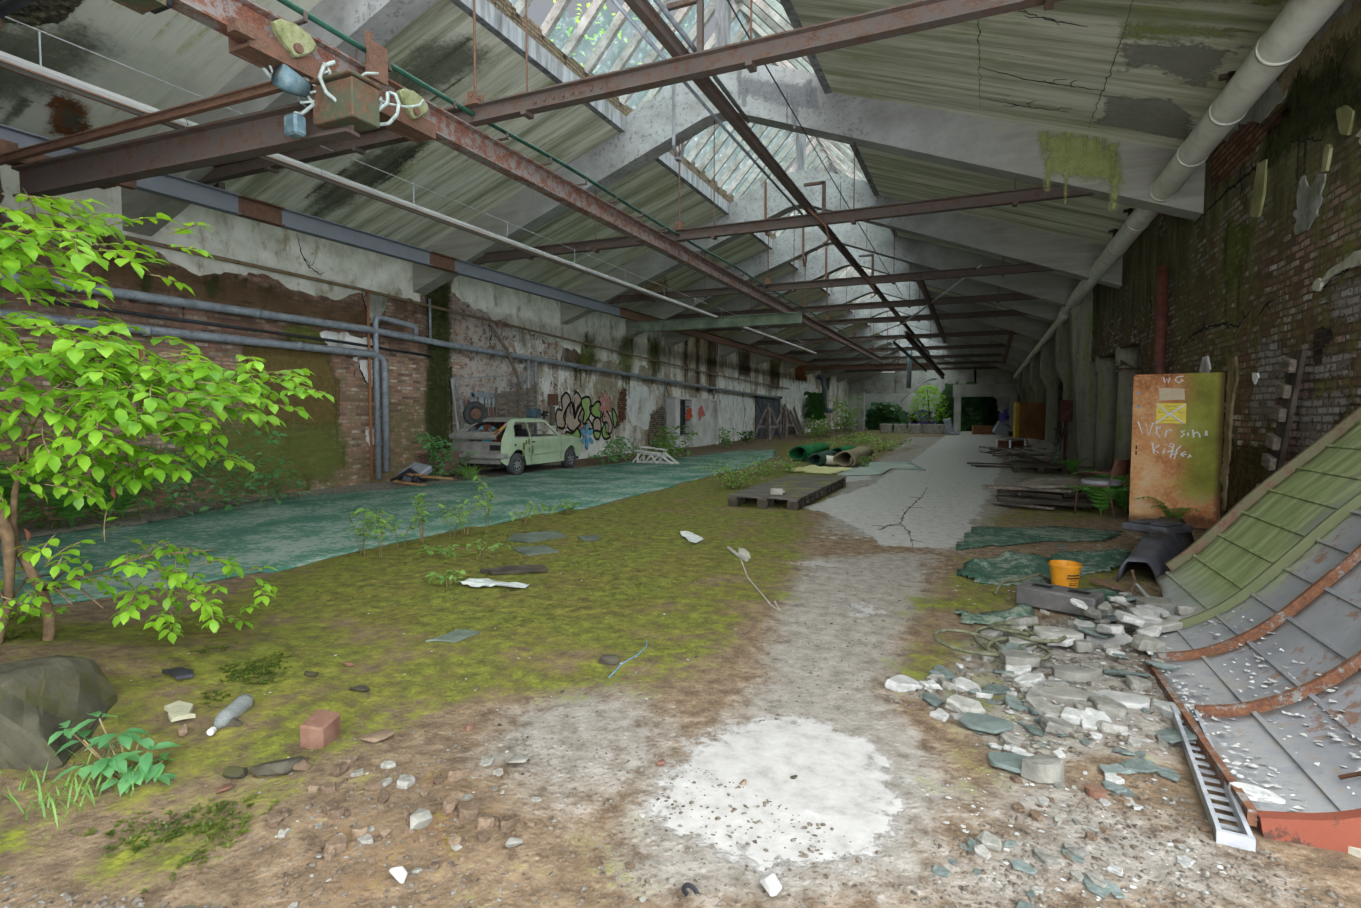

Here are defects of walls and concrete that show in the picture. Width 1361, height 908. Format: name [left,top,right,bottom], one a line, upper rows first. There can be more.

flaking render [1313,0,1361,41]
rust [0,59,149,136]
crack [977,1,1133,128]
spalling [1211,78,1290,193]
rust [257,156,718,319]
flaking render [1312,250,1361,291]
flaking render [451,275,649,368]
flaking render [615,383,666,451]
crack [872,488,927,546]